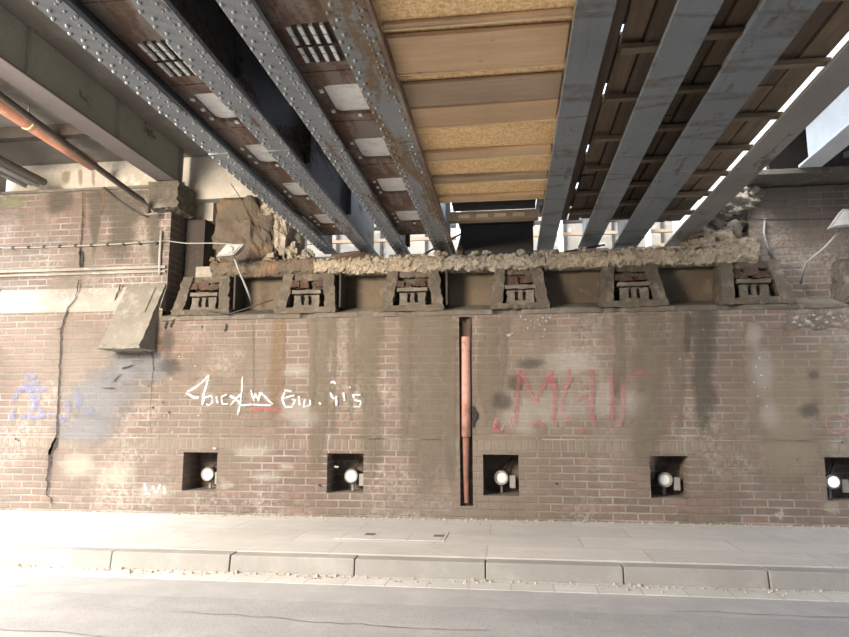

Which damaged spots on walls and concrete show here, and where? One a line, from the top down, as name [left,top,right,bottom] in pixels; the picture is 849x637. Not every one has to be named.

spalling [209,185,765,279]
crack [45,189,83,504]
leakage [635,310,715,451]
leakage [746,322,836,474]
spalling [783,308,849,331]